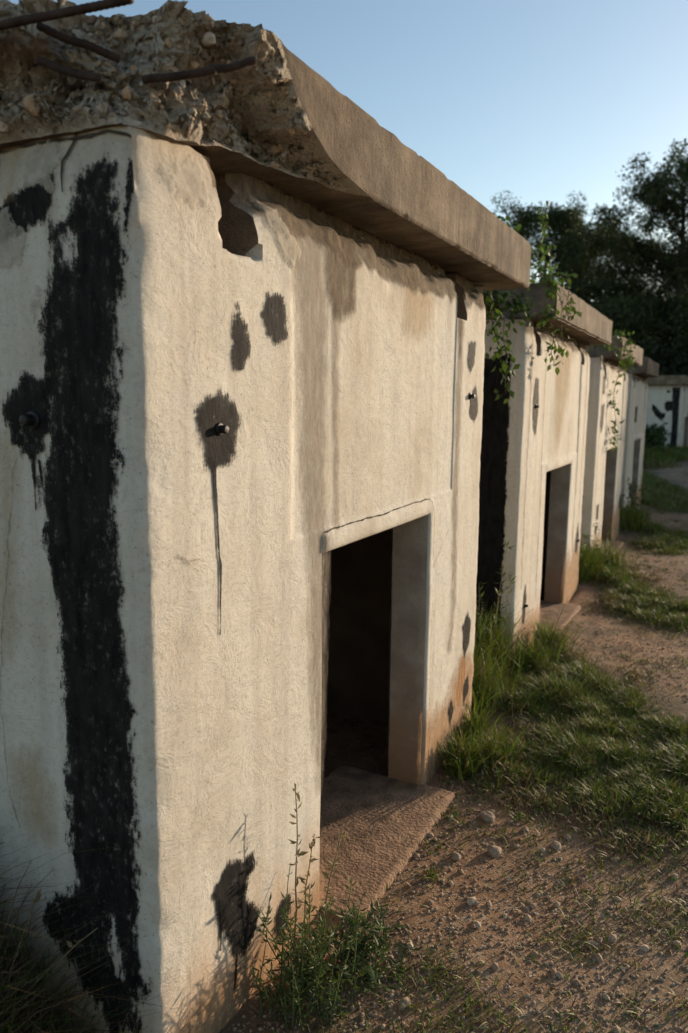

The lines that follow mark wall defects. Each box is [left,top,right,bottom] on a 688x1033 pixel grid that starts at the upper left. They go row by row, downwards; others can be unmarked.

spalling [0,0,134,63]
spalling [141,56,256,84]
crack [0,129,132,192]